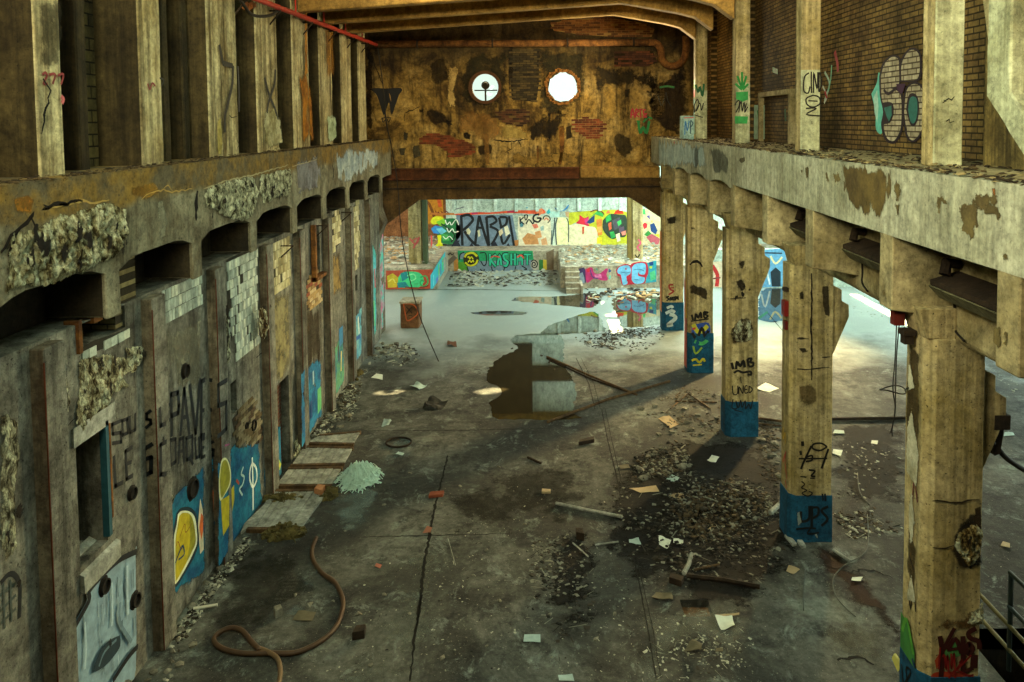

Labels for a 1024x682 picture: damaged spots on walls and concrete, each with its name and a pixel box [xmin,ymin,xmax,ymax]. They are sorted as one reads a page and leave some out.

flaking render [495,49,541,139]
flaking render [419,133,476,157]
flaking render [571,117,607,139]
spalling [204,168,293,222]
peeling [936,193,1000,241]
spalling [6,203,129,292]
spalling [732,319,753,342]
spalling [66,328,146,431]
spalling [0,414,23,566]
crack [370,429,512,682]
spalling [954,524,984,567]